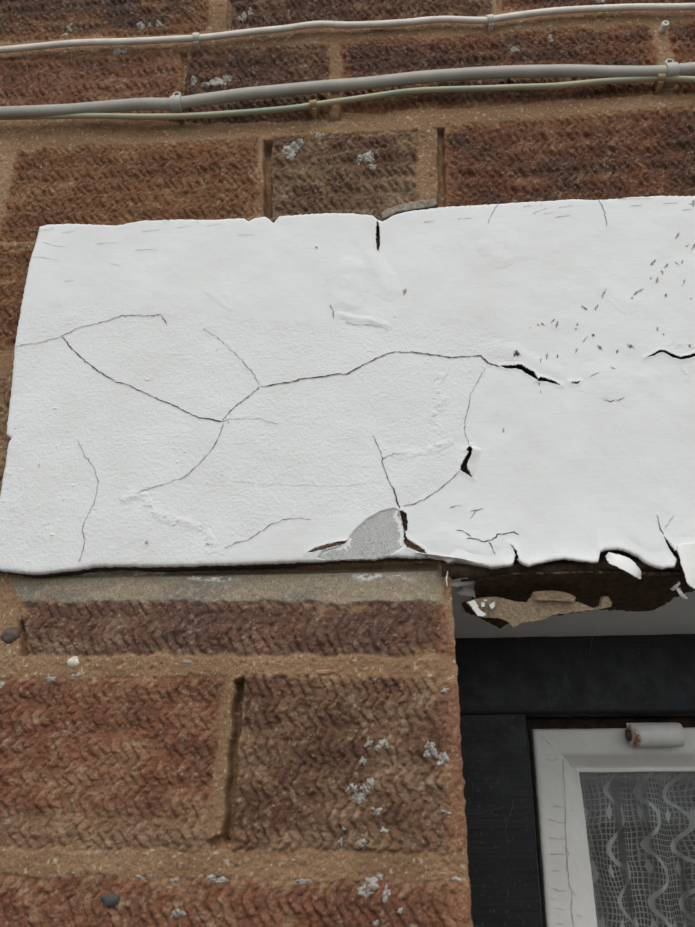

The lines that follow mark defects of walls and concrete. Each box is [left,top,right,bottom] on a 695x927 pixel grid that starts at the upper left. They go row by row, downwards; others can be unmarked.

crack [646,351,695,359]
crack [16,314,599,493]
peeling [318,509,404,560]
crack [373,436,519,553]
spalling [417,543,695,628]